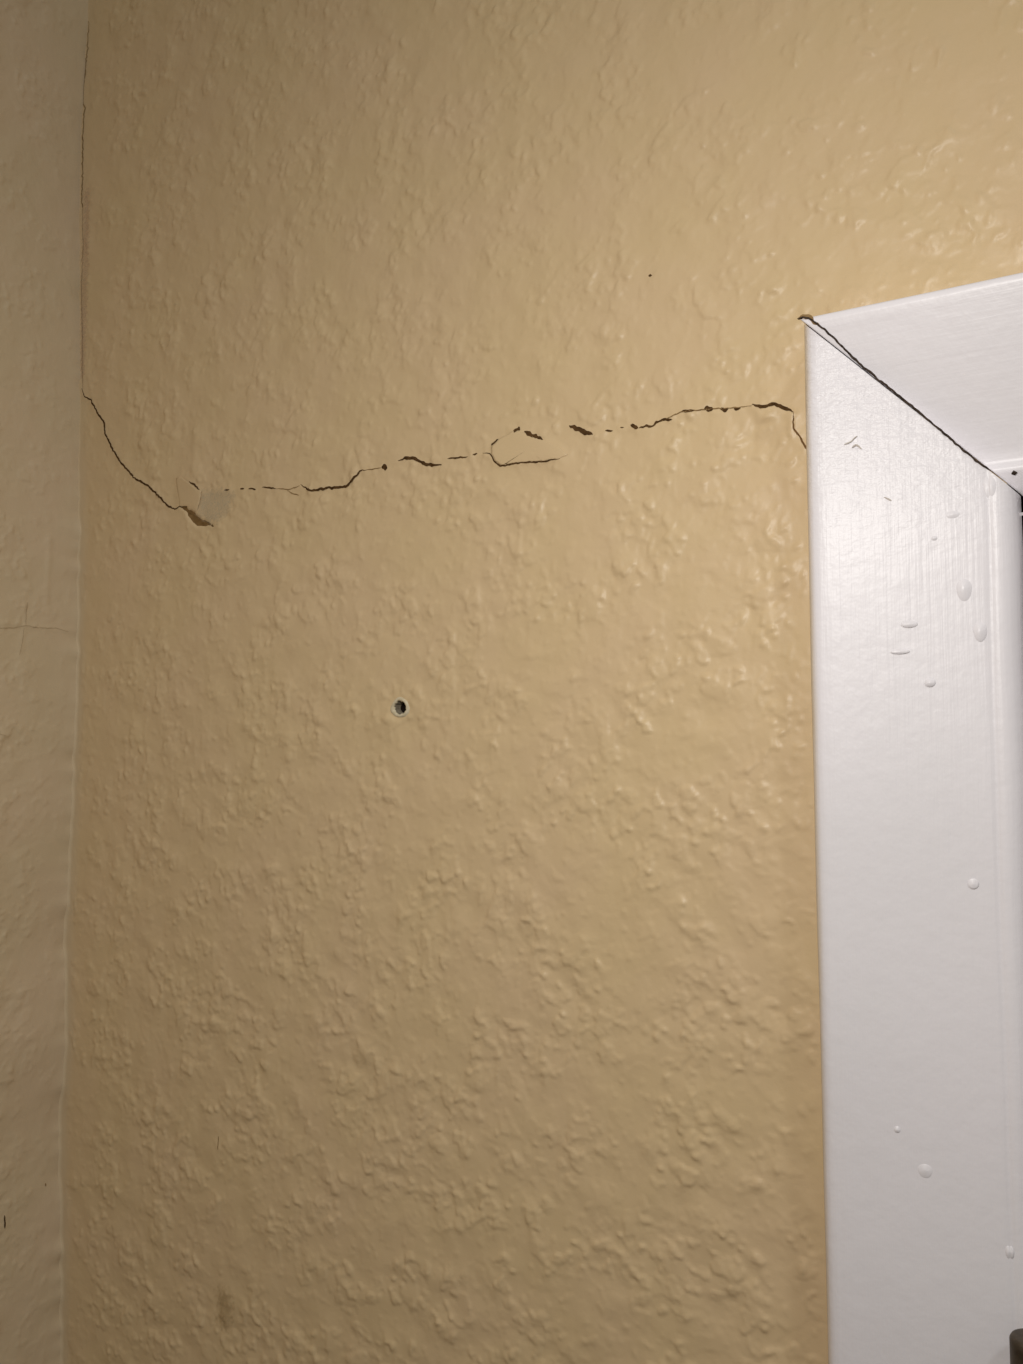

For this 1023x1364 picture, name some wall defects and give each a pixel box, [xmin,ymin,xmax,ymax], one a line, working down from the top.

peeling [176,476,214,527]
crack [81,21,806,510]